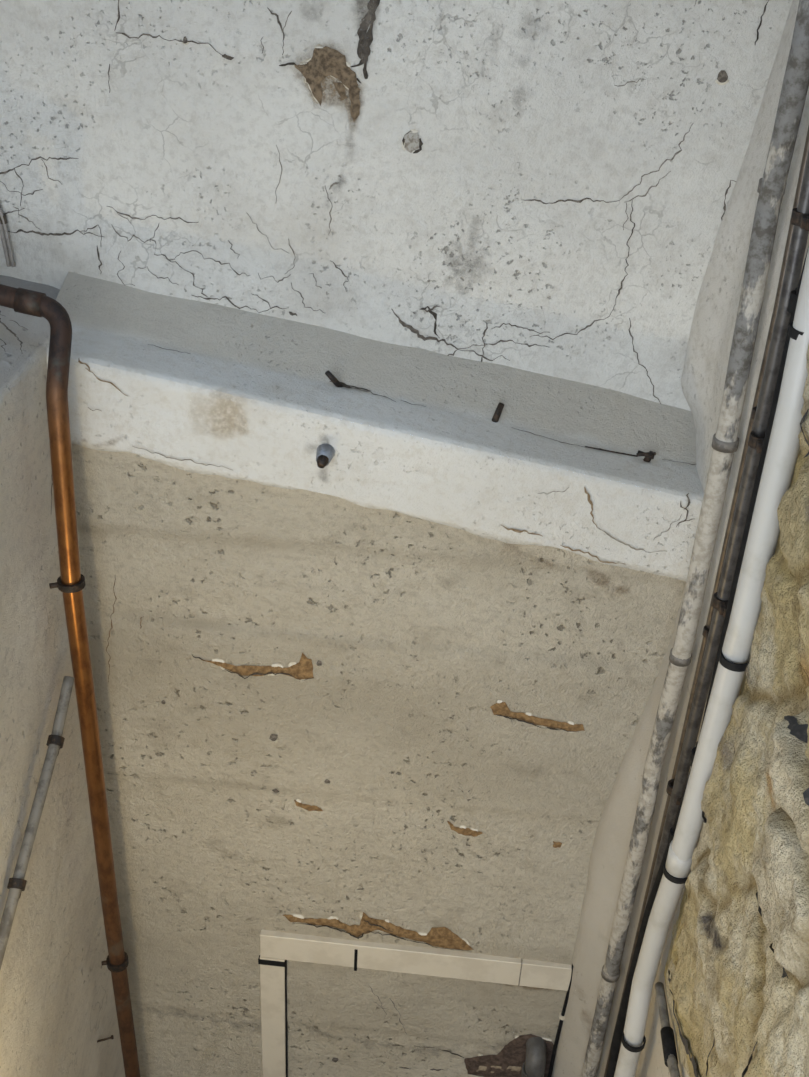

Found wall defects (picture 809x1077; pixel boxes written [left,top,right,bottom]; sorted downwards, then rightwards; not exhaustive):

crack [114,0,234,60]
crack [261,7,292,55]
crack [350,0,380,79]
spalling [279,44,361,122]
crack [0,156,348,316]
crack [392,124,693,404]
crack [0,311,28,352]
crack [329,381,426,407]